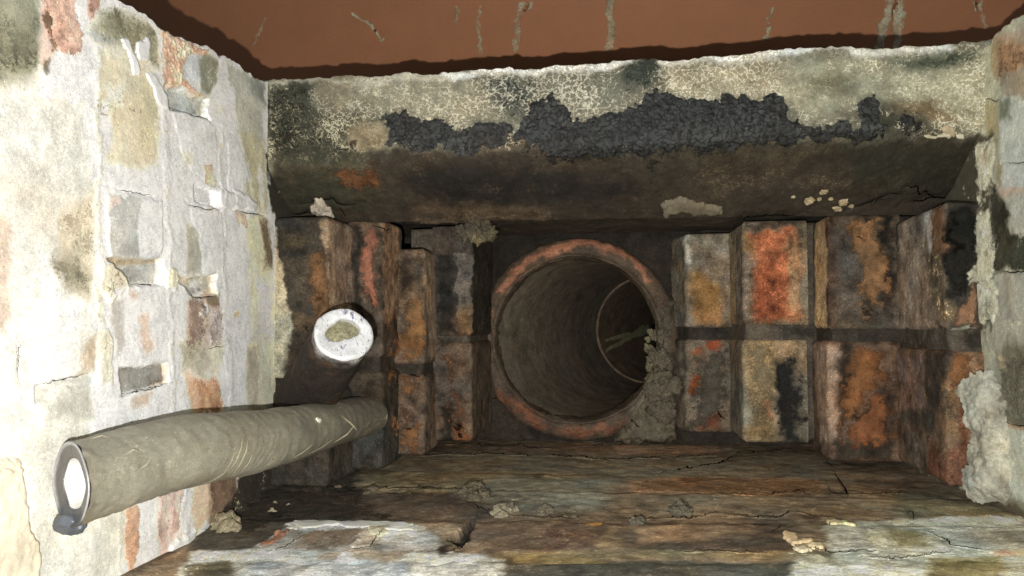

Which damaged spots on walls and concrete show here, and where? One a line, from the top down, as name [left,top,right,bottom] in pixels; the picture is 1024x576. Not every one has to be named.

leakage [623,58,662,91]
crack [855,185,947,207]
leakage [977,142,992,186]
rust [845,218,892,323]
leakage [951,211,992,331]
rust [837,346,898,450]
crack [423,419,793,476]
crack [645,461,982,559]